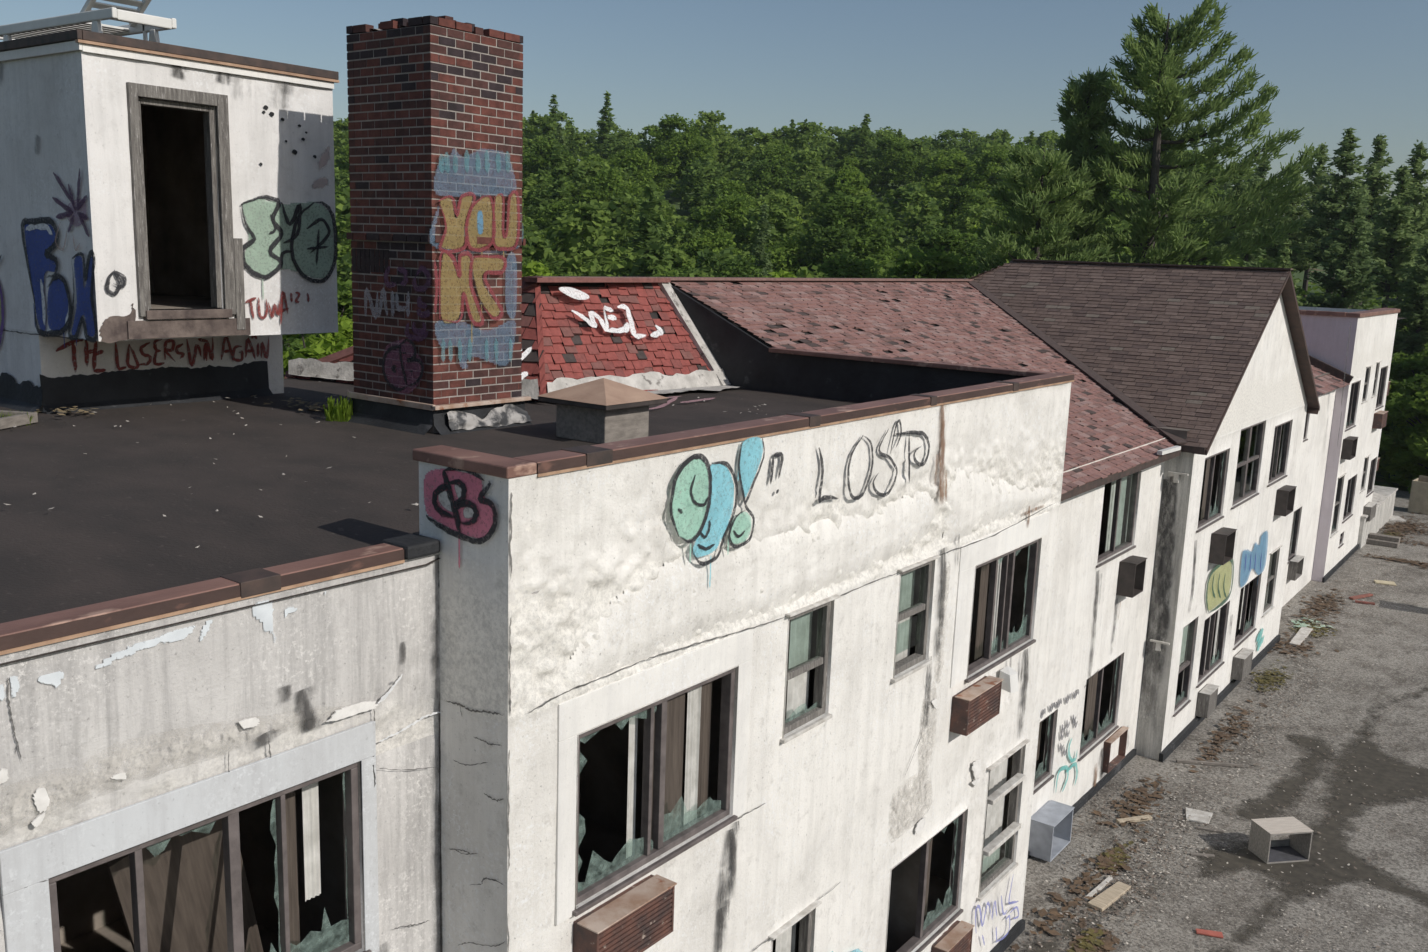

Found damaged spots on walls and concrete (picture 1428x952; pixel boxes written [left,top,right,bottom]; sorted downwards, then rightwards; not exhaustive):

crack [941,505,1050,555]
crack [842,572,899,595]
water stain [1144,476,1176,670]
peeling [95,619,213,669]
water stain [926,536,960,725]
peeling [0,676,20,701]
crack [7,678,22,761]
spalling [0,717,287,831]
water stain [284,686,316,730]
spalling [326,701,378,722]
crack [373,617,784,885]
water stain [717,829,737,948]